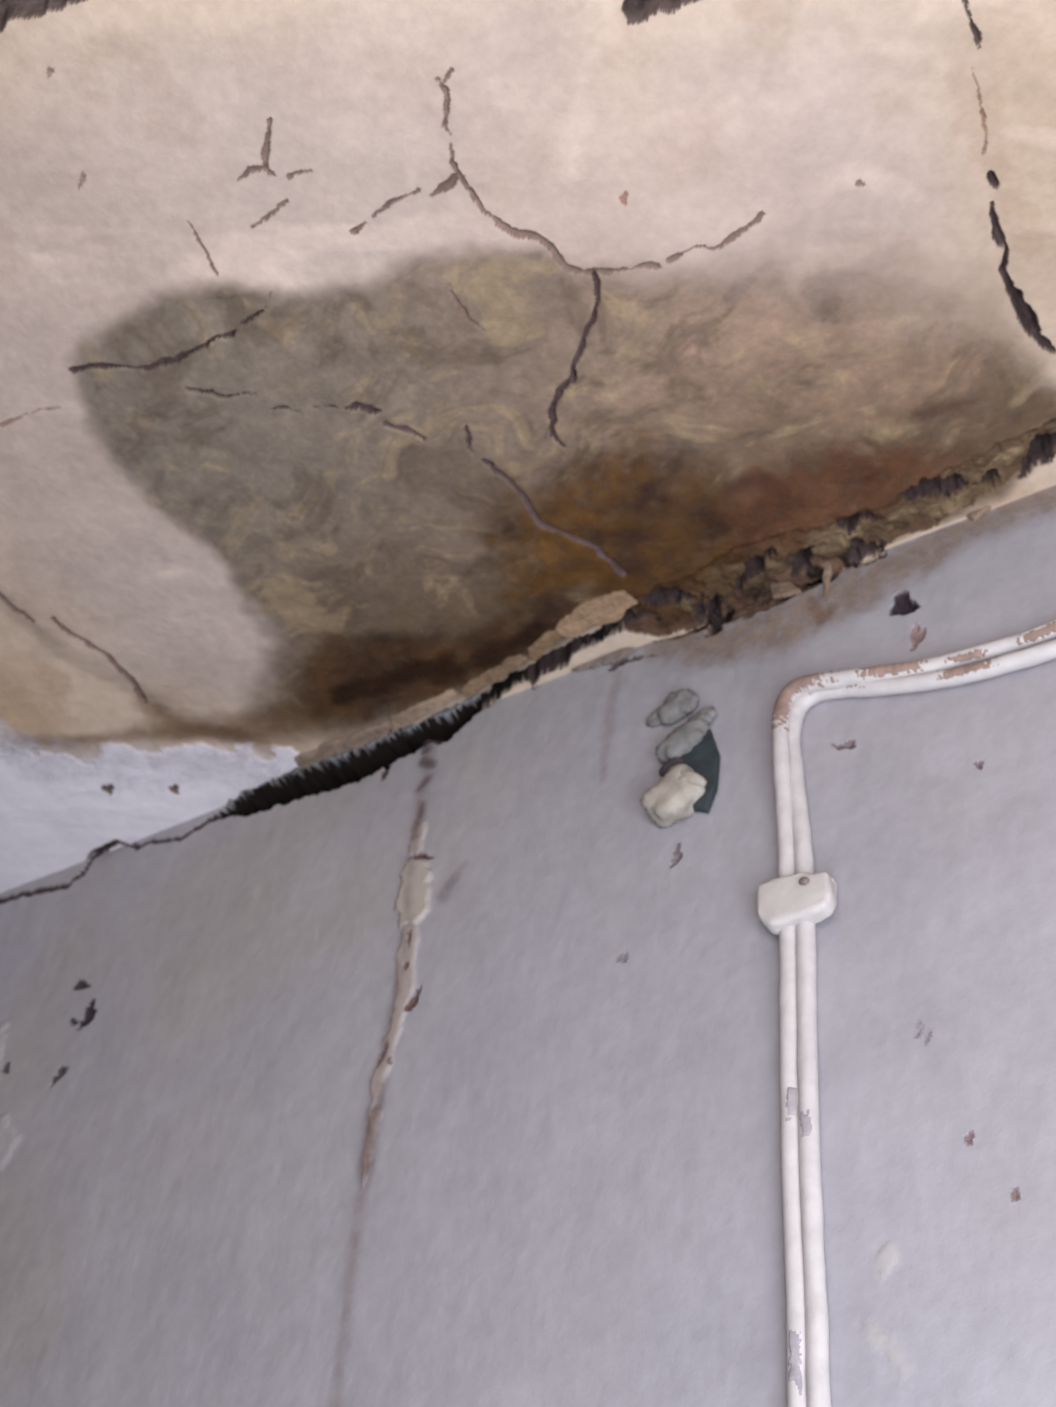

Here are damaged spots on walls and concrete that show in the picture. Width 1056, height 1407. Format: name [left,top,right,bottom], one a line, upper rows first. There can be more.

crack [0,0,88,34]
crack [620,0,701,27]
crack [235,117,314,230]
crack [960,0,1056,355]
crack [185,219,220,278]
crack [348,66,767,447]
crack [0,405,61,429]
crack [66,309,426,442]
water stain [82,253,1056,735]
crack [0,425,659,904]